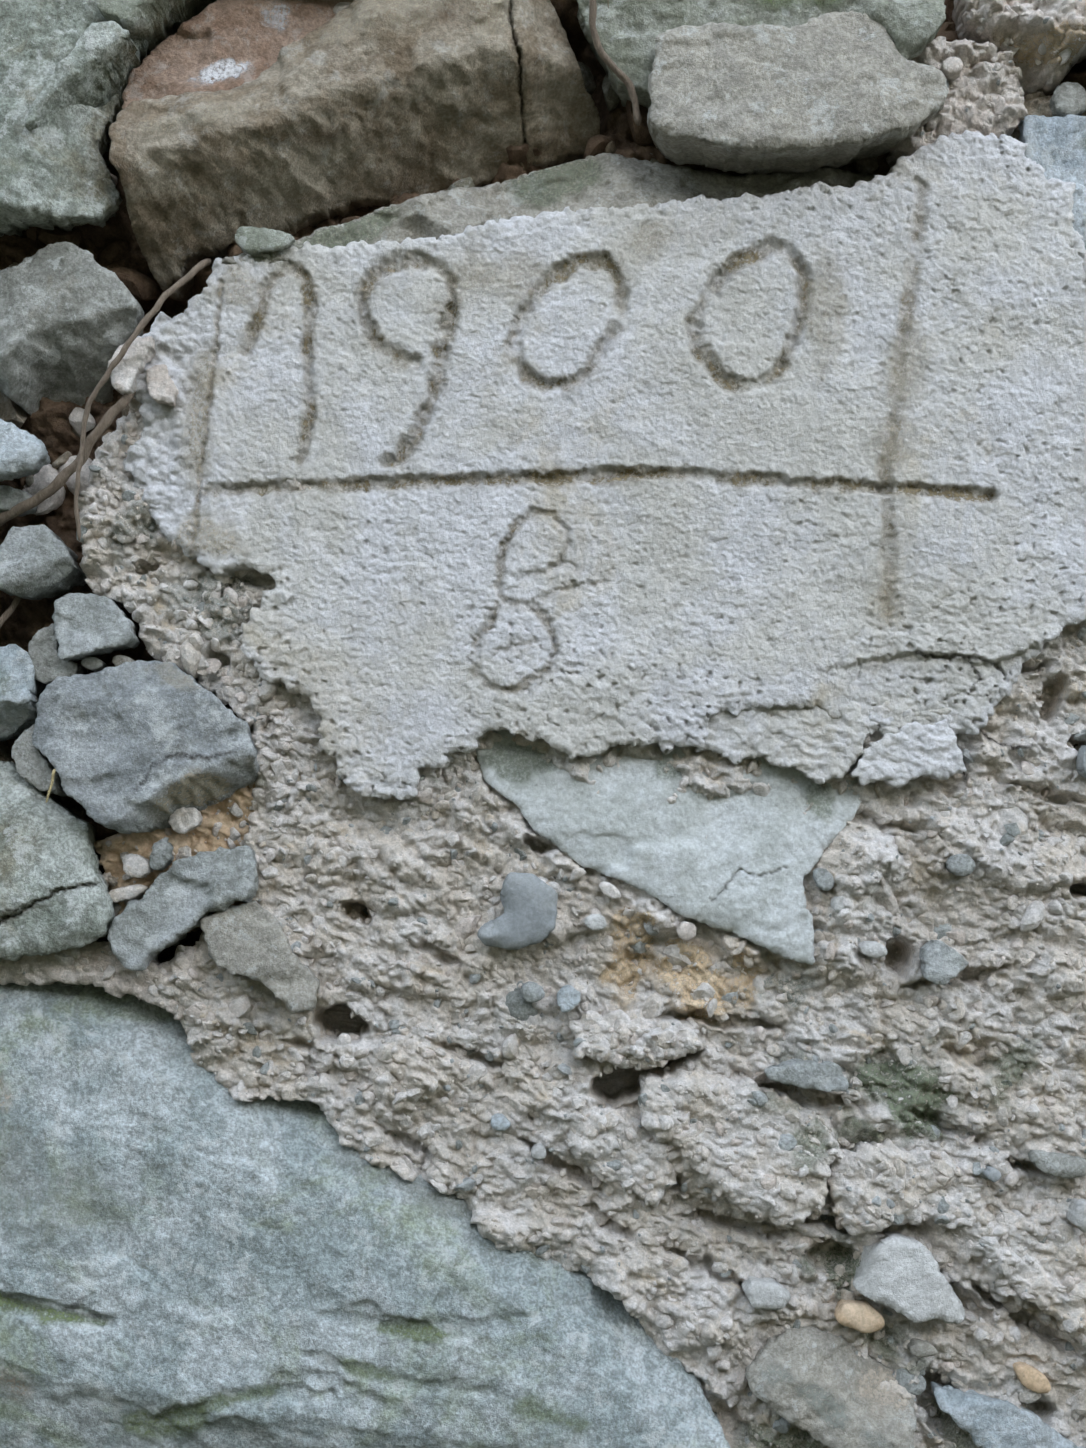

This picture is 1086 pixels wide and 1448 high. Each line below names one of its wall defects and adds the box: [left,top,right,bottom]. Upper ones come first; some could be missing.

crack [0,883,97,924]
spalling [78,402,1086,1448]